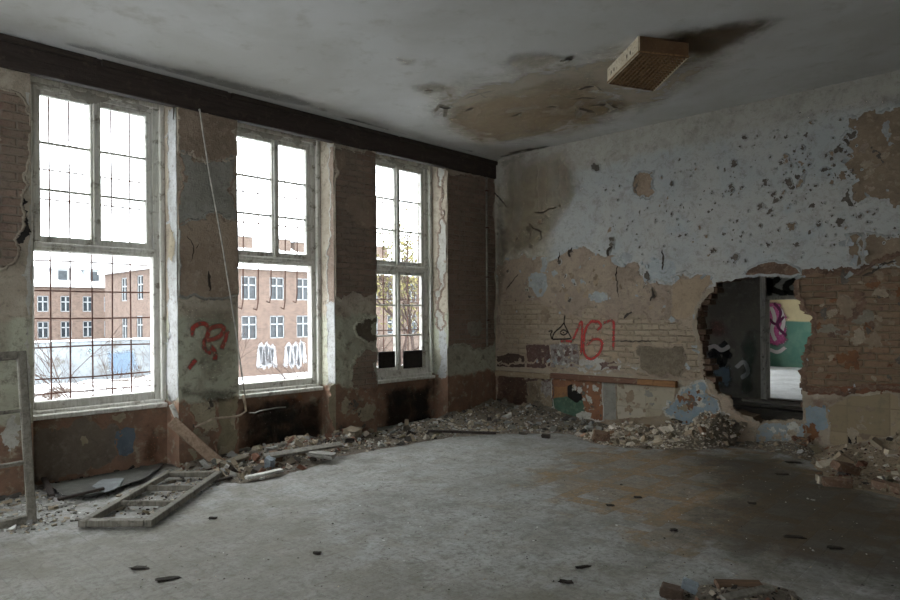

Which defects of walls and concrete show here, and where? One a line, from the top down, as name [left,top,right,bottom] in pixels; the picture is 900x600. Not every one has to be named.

peeling [0,81,316,454]
crack [528,207,556,241]
leakage [448,21,765,141]
flaking render [325,103,900,442]